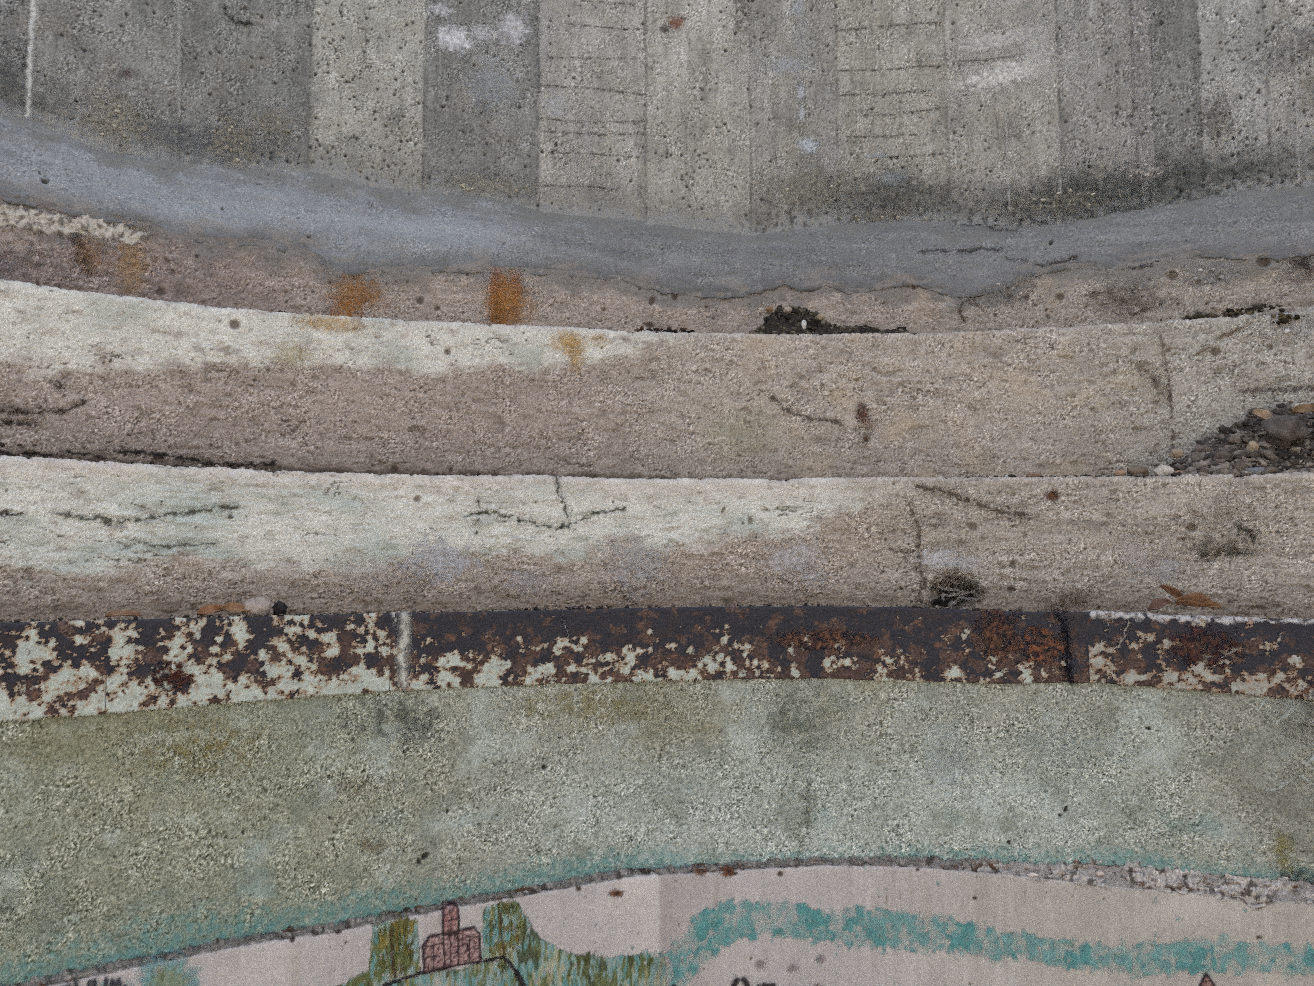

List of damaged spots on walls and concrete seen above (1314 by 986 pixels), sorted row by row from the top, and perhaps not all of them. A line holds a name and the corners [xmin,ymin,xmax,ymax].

crack [0,380,276,467]
crack [0,508,23,516]
crack [55,501,247,549]
rust [151,661,190,691]
peeling [821,638,859,673]
peeling [877,649,897,670]
peeling [984,655,1009,681]
peeling [1125,631,1156,658]
peeling [1157,637,1182,659]
rust [1158,626,1241,668]
peeling [1287,655,1305,668]
spalling [970,856,999,872]